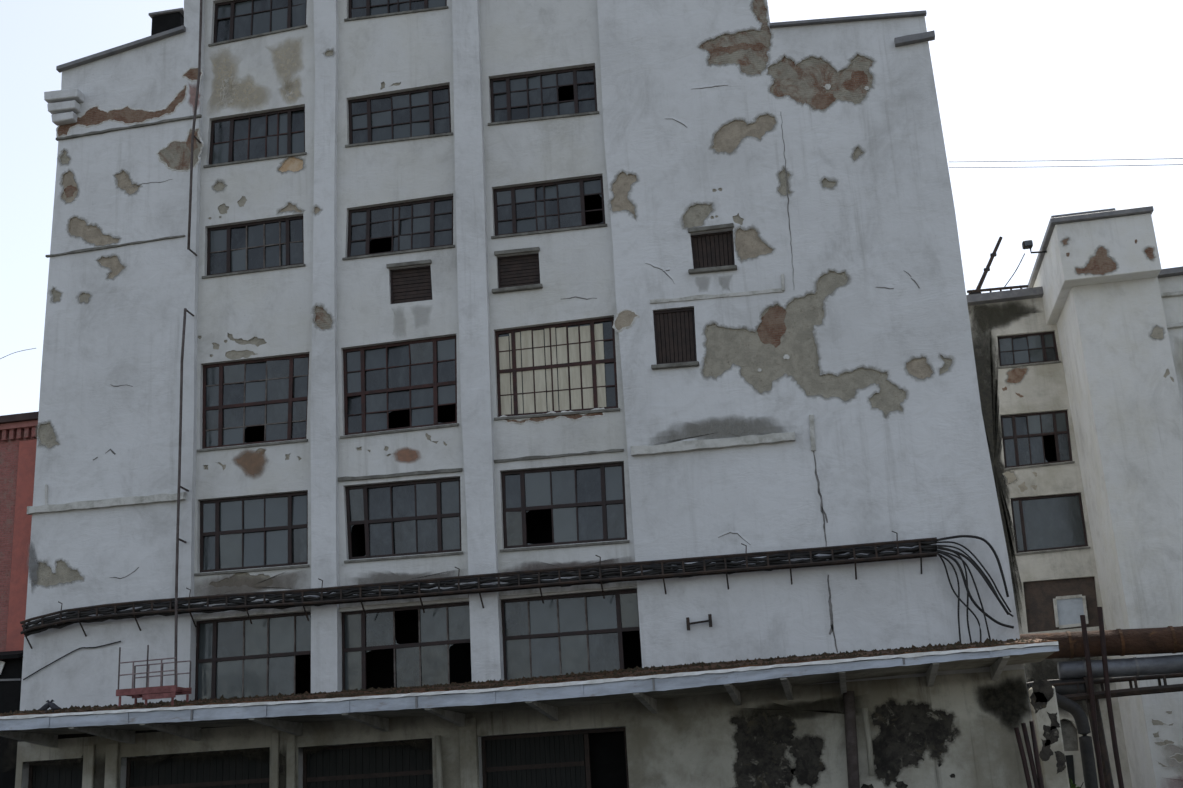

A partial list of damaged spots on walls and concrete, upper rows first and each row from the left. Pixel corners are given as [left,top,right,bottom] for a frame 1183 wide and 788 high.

flaking render [699,0,874,111]
flaking render [56,67,204,203]
flaking render [710,113,776,154]
flaking render [610,171,638,219]
flaking render [68,217,125,279]
flaking render [1062,238,1117,275]
flaking render [702,270,907,418]
flaking render [905,355,953,380]
crack [813,451,828,547]
flaking render [35,560,84,587]
crack [827,575,838,653]
water stain [742,698,844,720]